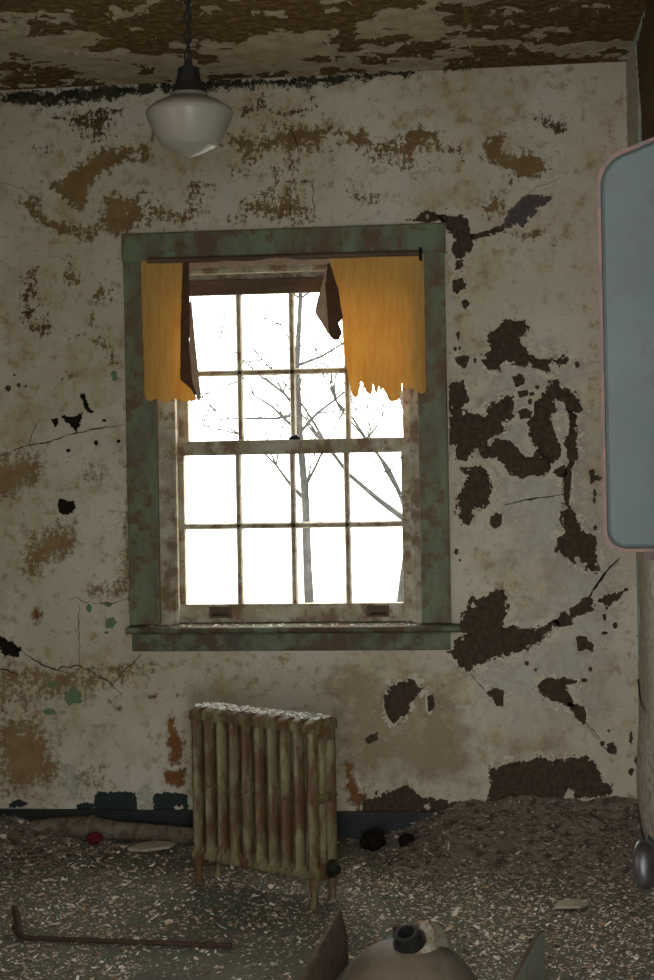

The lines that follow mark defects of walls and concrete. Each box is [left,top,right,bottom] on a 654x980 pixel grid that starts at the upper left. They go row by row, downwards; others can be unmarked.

leakage [0,83,175,111]
peeling [0,0,654,147]
leakage [202,69,471,93]
leakage [14,131,215,244]
spalling [399,192,557,310]
leakage [0,450,47,501]
spalling [447,311,605,574]
leakage [21,518,77,579]
spalling [441,552,654,725]
leakage [0,656,159,801]
spalling [365,672,435,744]
spalling [481,750,621,801]